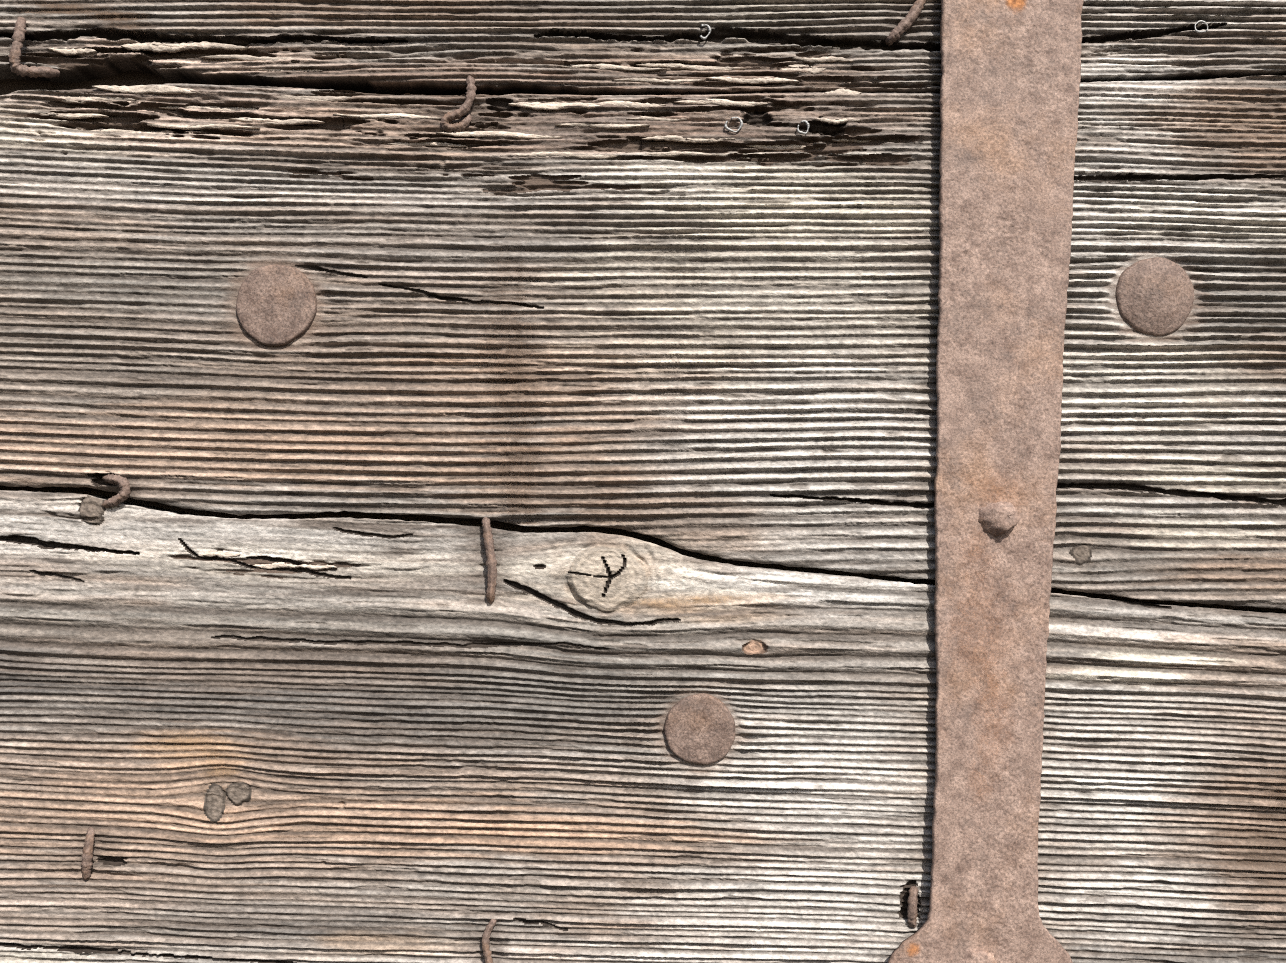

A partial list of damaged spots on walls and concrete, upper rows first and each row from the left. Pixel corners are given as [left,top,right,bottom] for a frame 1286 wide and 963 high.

crack [0,27,408,46]
crack [770,494,934,509]
crack [1056,482,1286,507]
crack [332,527,413,539]
crack [0,535,140,583]
crack [178,538,351,579]
crack [1116,600,1172,609]